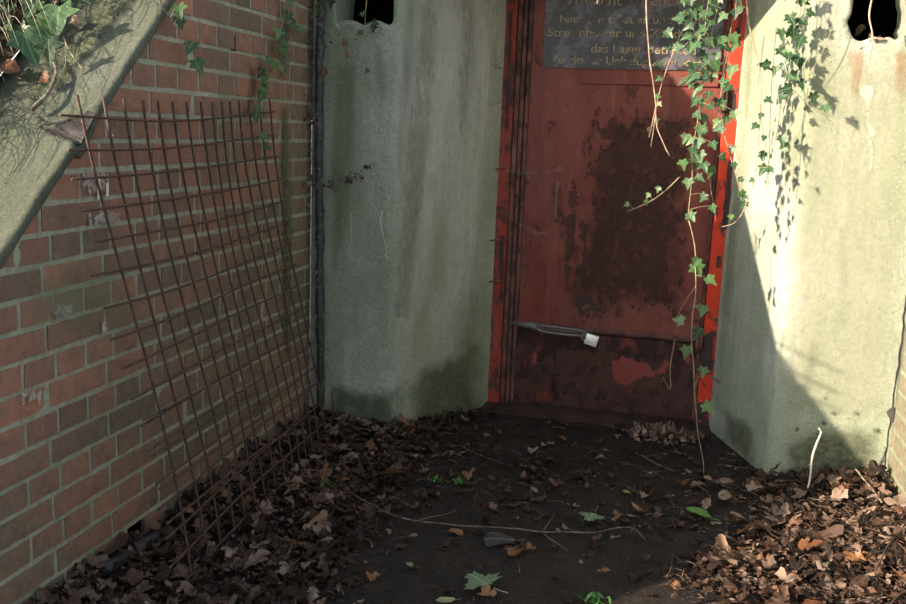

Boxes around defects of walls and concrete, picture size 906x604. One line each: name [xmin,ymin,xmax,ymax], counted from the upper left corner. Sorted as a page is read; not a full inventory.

leakage [860,85,876,170]
corrosion [564,106,702,318]
peeling [611,356,669,385]
peeling [681,332,713,376]
peeling [693,399,710,426]